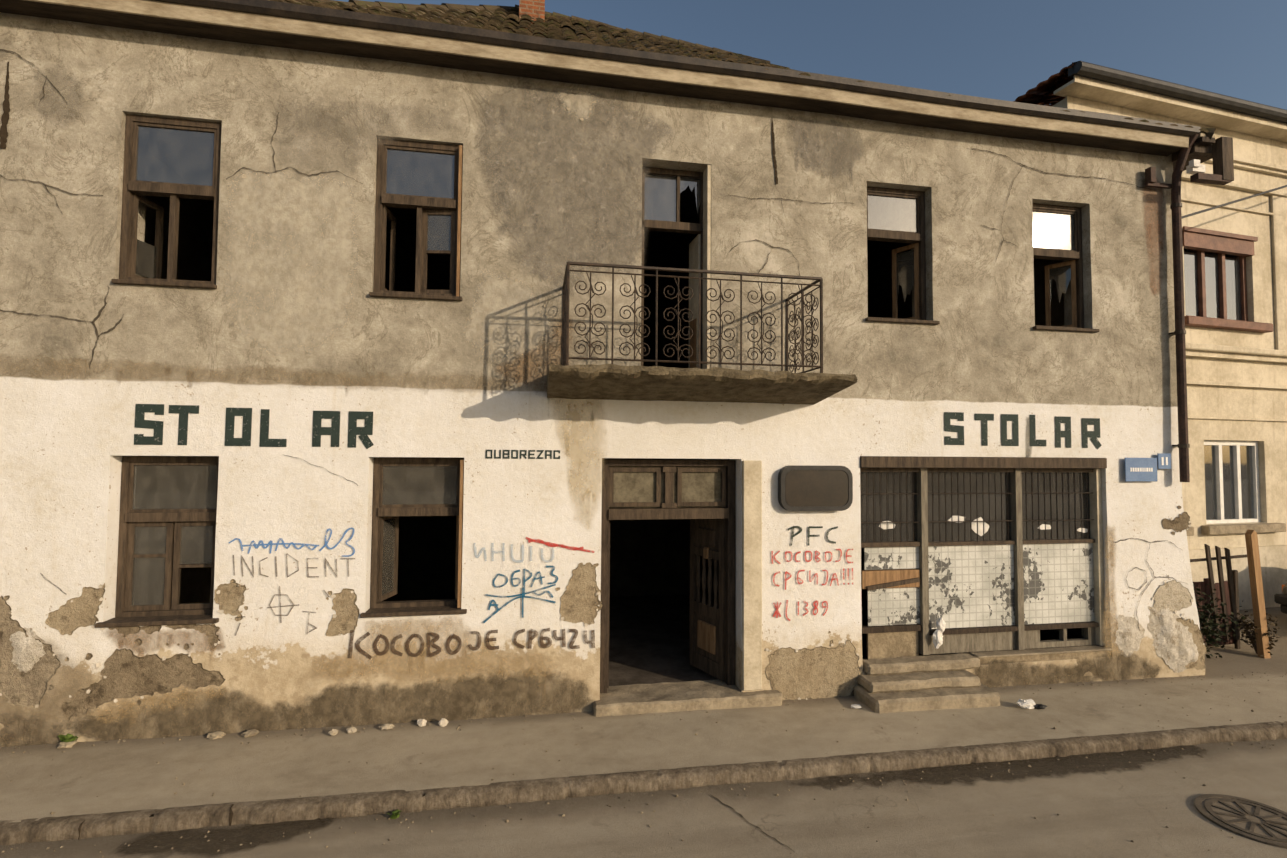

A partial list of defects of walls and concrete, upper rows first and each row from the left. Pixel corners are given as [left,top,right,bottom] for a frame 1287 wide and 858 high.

crack [0,49,103,213]
crack [226,112,363,184]
crack [0,287,123,369]
peeling [1162,506,1191,535]
peeling [0,579,248,721]
peeling [326,588,360,636]
peeling [556,562,602,627]
peeling [766,631,860,700]
peeling [1153,575,1207,670]
water stain [0,669,591,747]